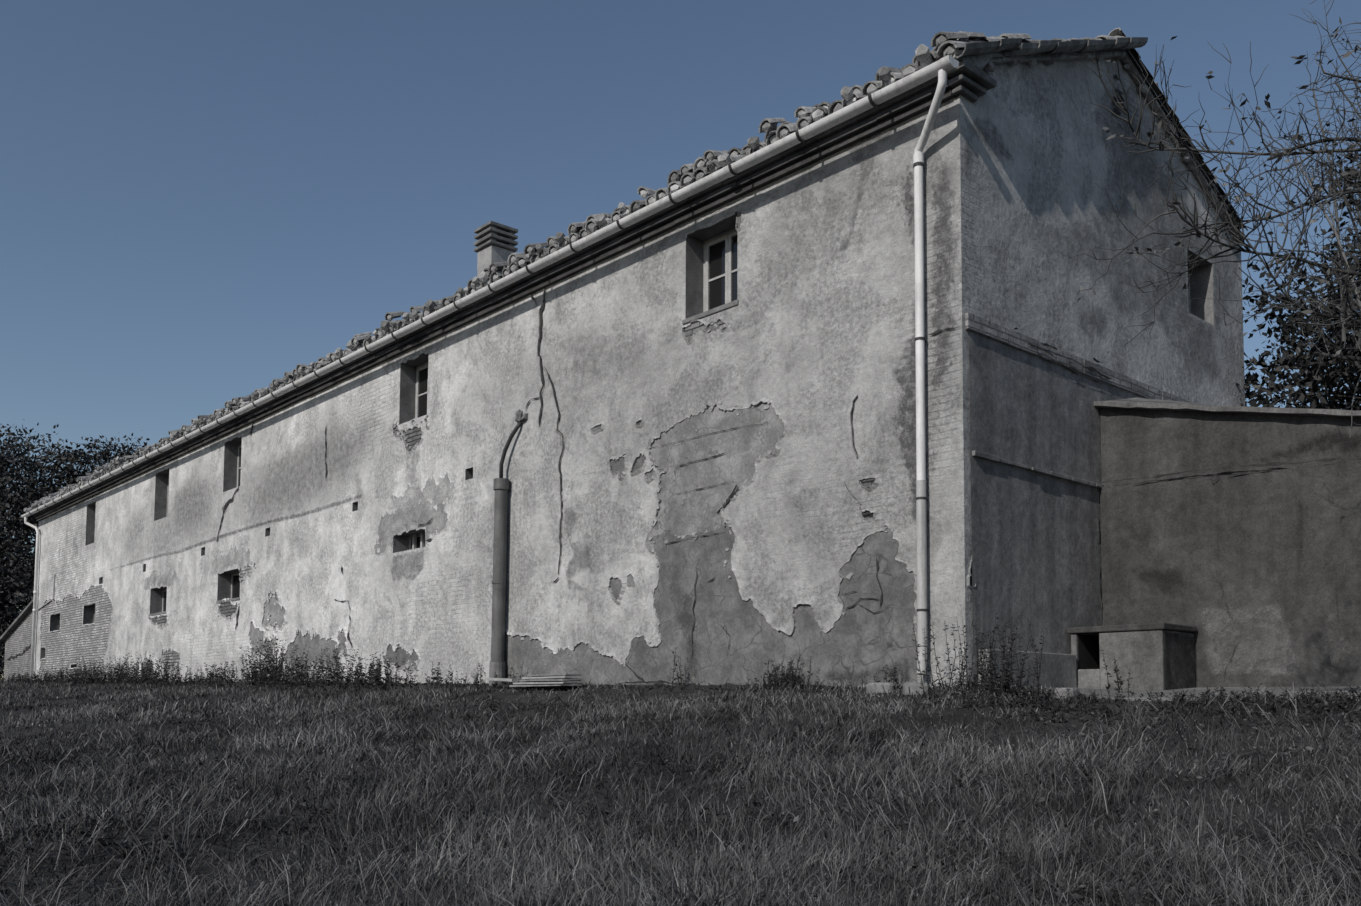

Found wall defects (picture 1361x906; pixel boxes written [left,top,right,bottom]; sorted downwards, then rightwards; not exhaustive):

crack [526,287,564,583]
crack [216,488,239,542]
spalling [209,542,257,585]
spalling [374,471,456,557]
flaking render [504,398,922,687]
flaking render [39,584,114,679]
flaking render [216,588,350,678]